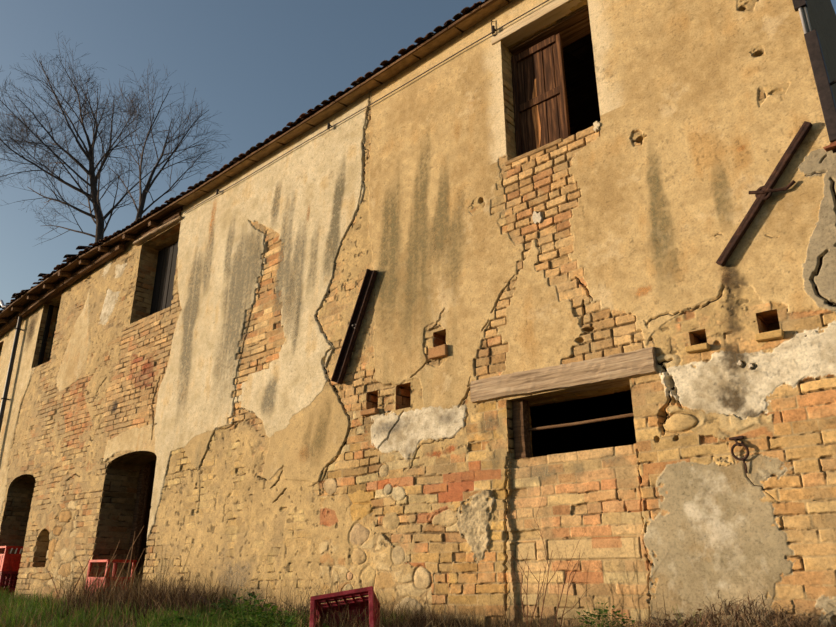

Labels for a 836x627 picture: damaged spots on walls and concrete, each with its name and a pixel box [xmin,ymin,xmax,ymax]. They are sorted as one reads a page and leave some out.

leakage [179,261,211,404]
leakage [222,235,261,366]
leakage [276,220,304,342]
spalling [142,120,471,624]
leakage [325,180,344,269]
crack [316,97,371,478]
spalling [467,121,836,627]
leakage [722,265,744,332]
leakage [722,345,744,370]
leakage [719,382,758,417]
crack [808,158,836,201]
crack [815,253,836,307]